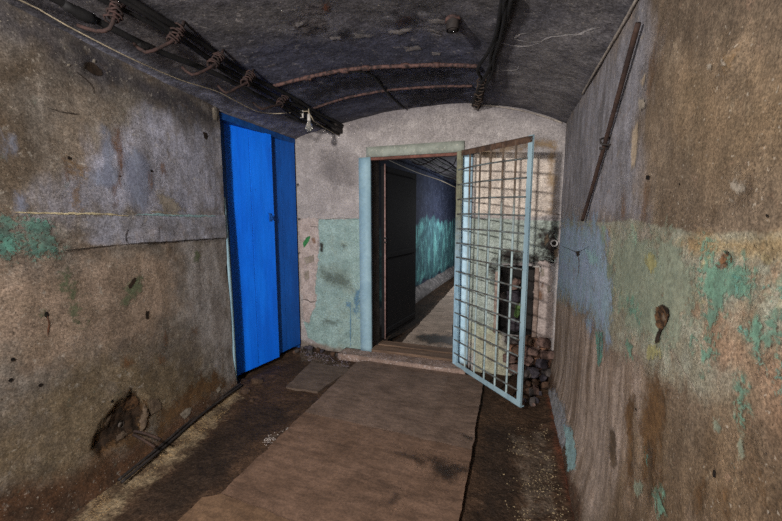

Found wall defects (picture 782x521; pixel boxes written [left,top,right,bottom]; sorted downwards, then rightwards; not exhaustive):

peeling [0,212,127,266]
flaking render [298,217,334,323]
peeling [509,214,769,380]
peeling [737,286,782,379]
flaking render [93,391,161,453]